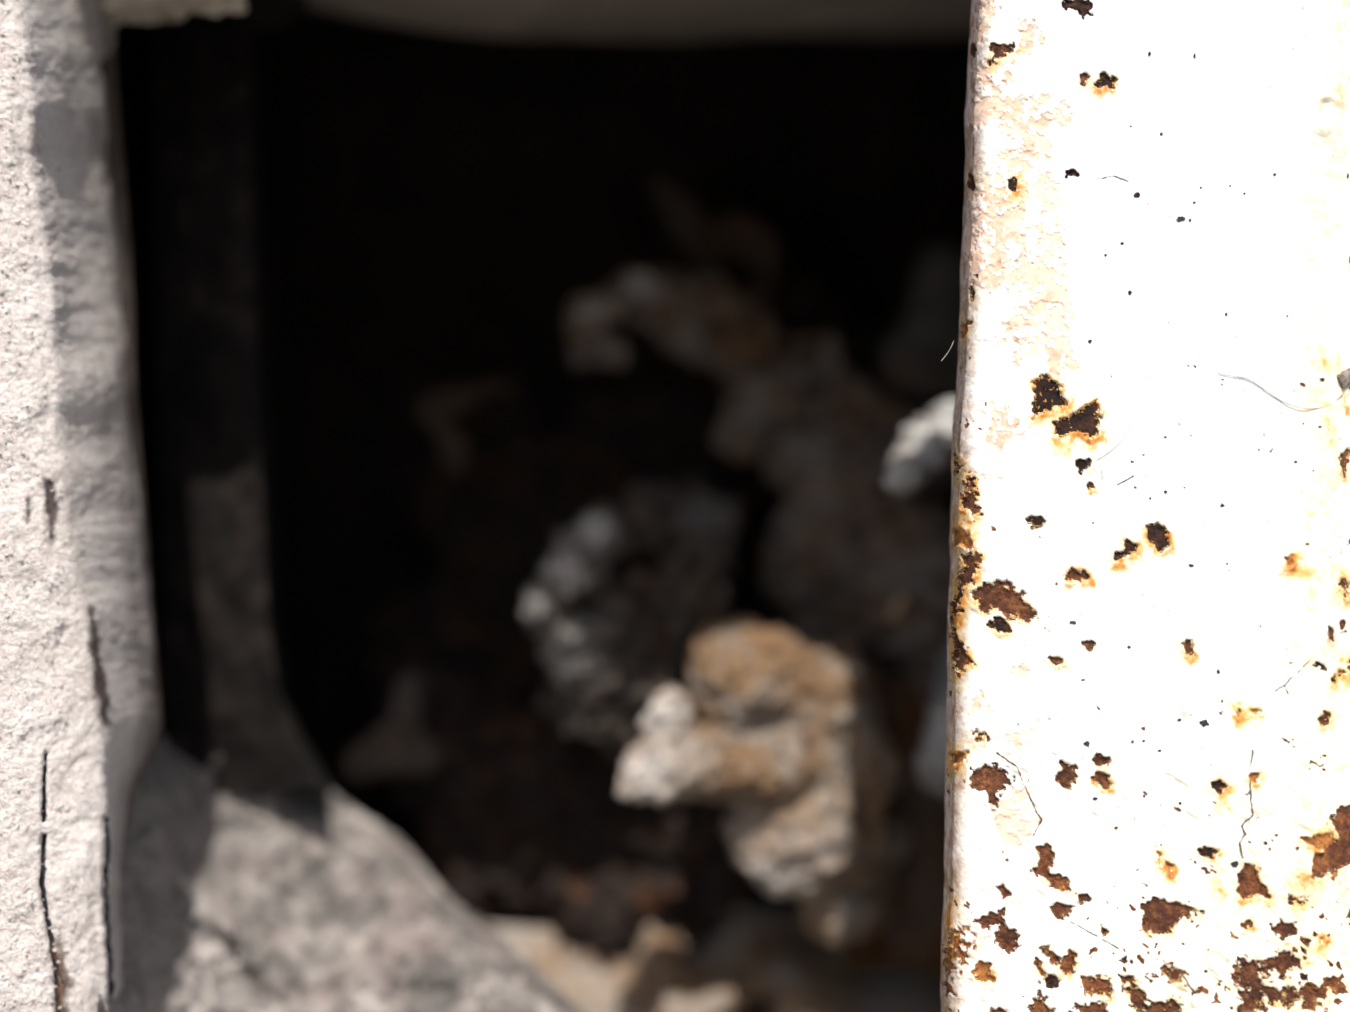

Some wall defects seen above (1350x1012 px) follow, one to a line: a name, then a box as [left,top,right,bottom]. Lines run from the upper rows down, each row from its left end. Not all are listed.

peeling [964,0,1081,380]
peeling [971,400,1028,481]
rust [1029,373,1108,495]
rust [1053,566,1096,589]
rust [1081,640,1096,652]
rust [1110,522,1175,572]
rust [1181,639,1199,666]
rust [1327,571,1350,642]
rust [1317,710,1333,728]
rust [947,728,1016,812]
crack [39,753,64,992]
rust [942,884,1022,1012]